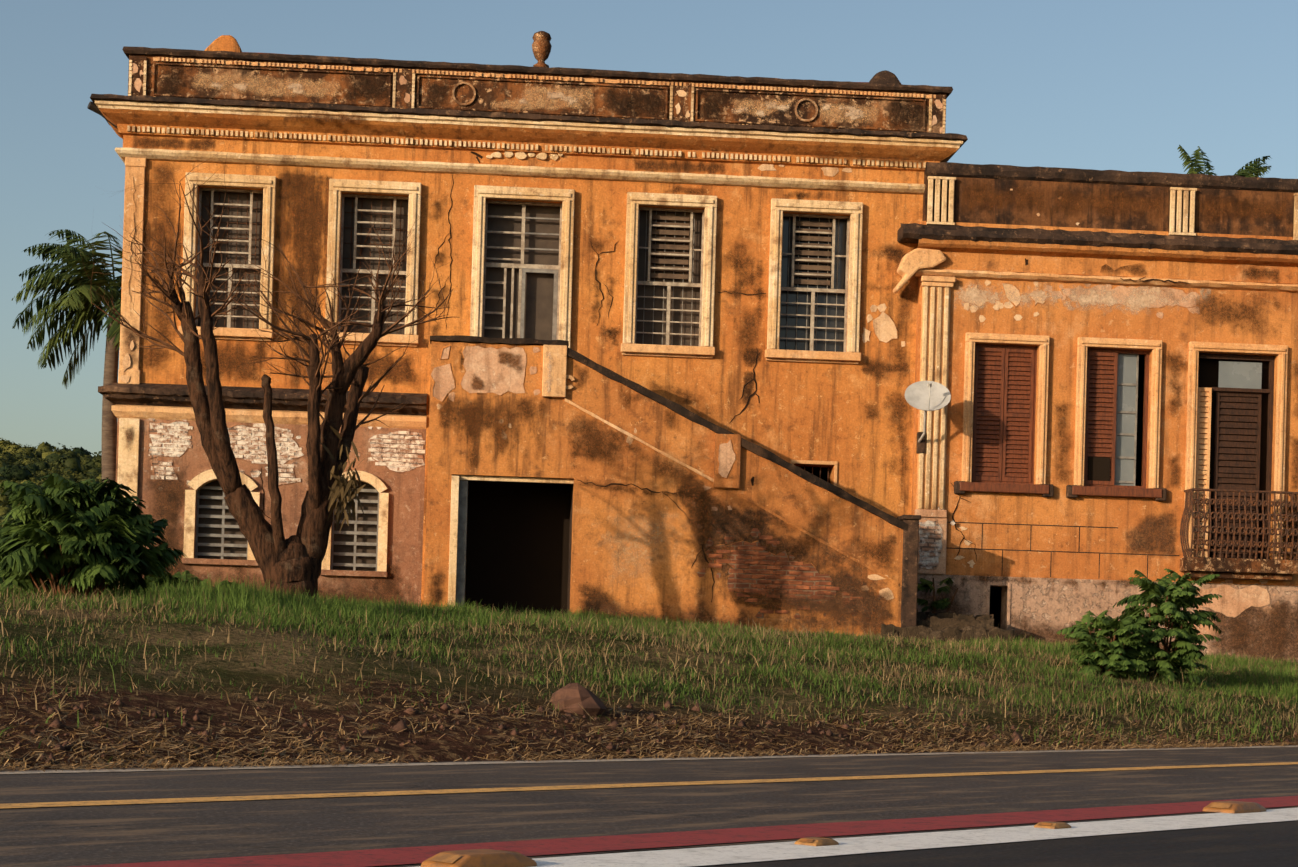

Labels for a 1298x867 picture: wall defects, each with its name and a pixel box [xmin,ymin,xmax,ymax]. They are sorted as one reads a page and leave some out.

damp [604,89,663,118]
crack [433,151,483,327]
flaking render [862,303,905,347]
flaking render [955,279,1211,322]
flaking render [431,345,540,409]
flaking render [147,418,193,488]
flaking render [227,423,306,486]
flaking render [355,426,426,474]
flaking render [703,438,736,490]
flaking render [697,528,894,619]
damp [1209,603,1298,661]